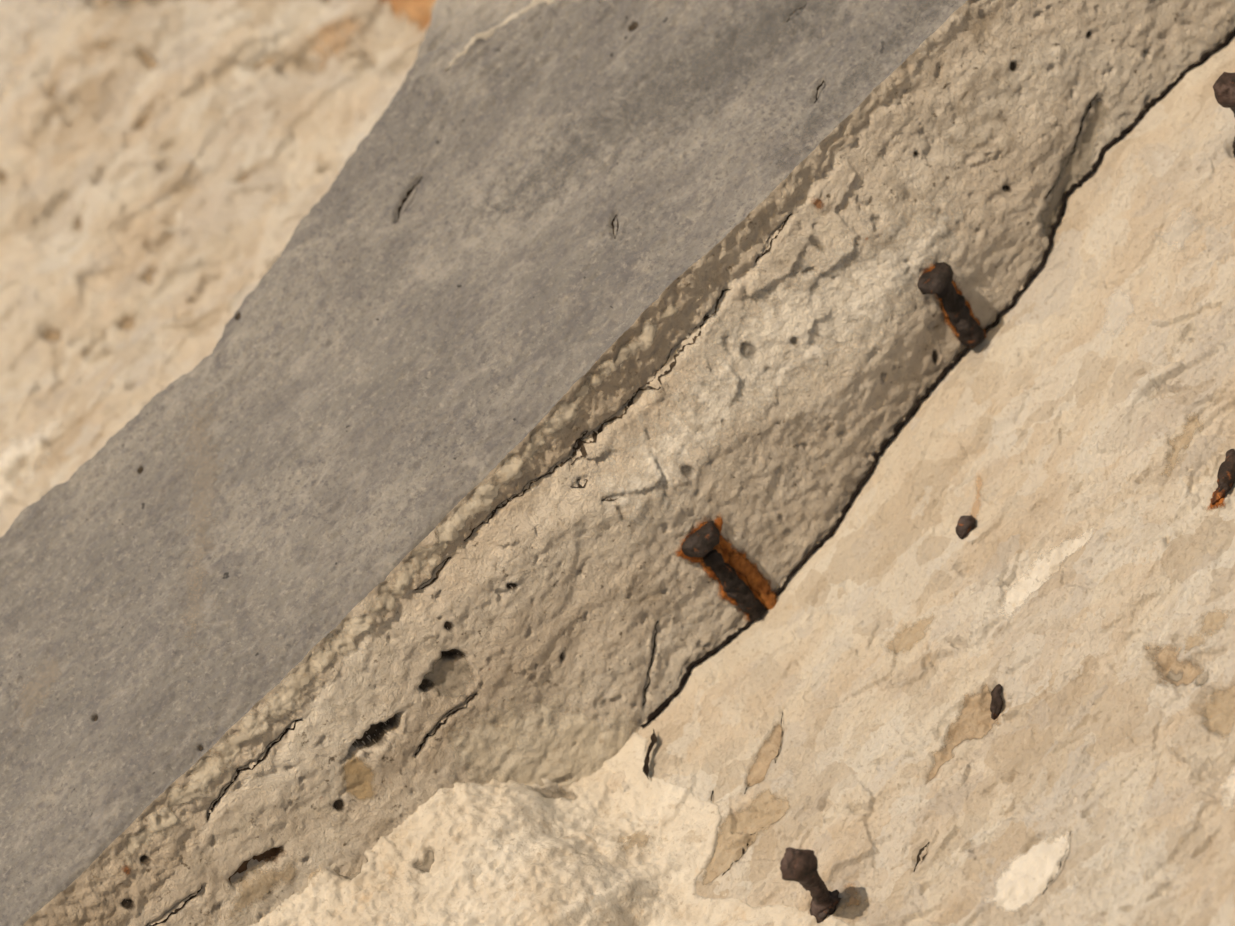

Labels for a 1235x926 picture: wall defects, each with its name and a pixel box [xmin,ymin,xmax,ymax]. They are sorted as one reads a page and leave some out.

crack [640,28,1235,779]
crack [415,289,731,590]
rust [1208,488,1225,509]
rust [676,516,777,621]
spalling [419,649,473,697]
spalling [352,713,398,747]
crack [415,693,477,756]
crack [207,719,302,820]
rust [818,883,860,918]